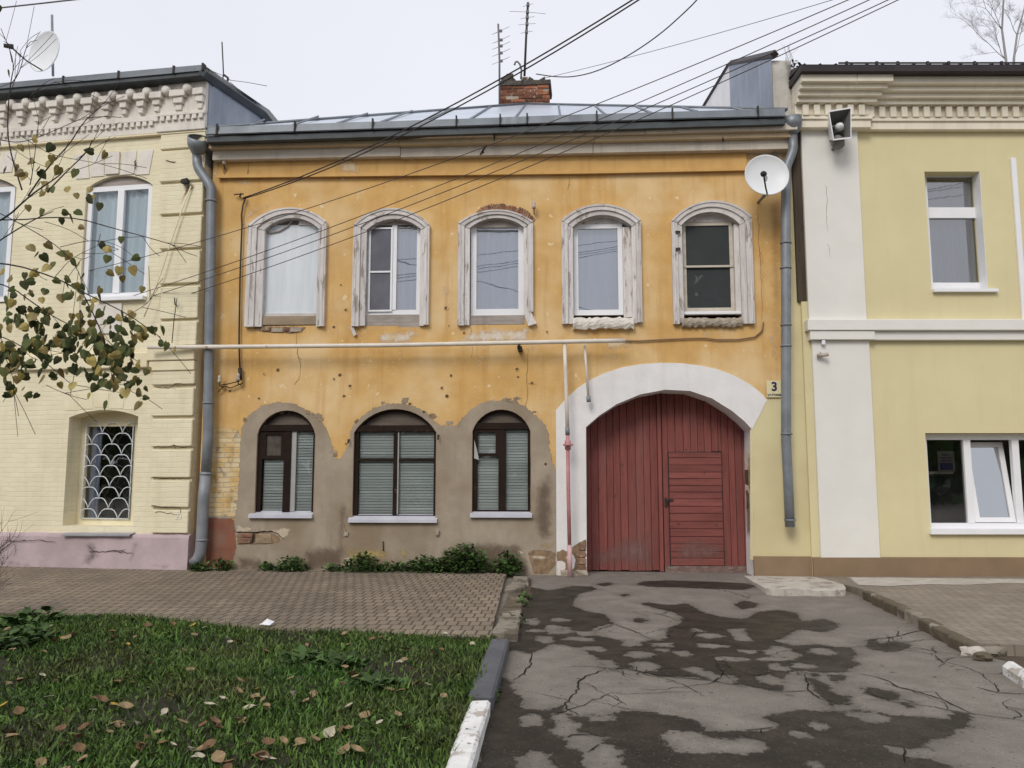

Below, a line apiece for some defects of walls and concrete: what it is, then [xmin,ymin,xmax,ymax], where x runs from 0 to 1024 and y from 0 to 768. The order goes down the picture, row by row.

flaking render [476,204,535,222]
flaking render [206,418,290,568]
damp [539,485,548,532]
flaking render [519,539,589,576]